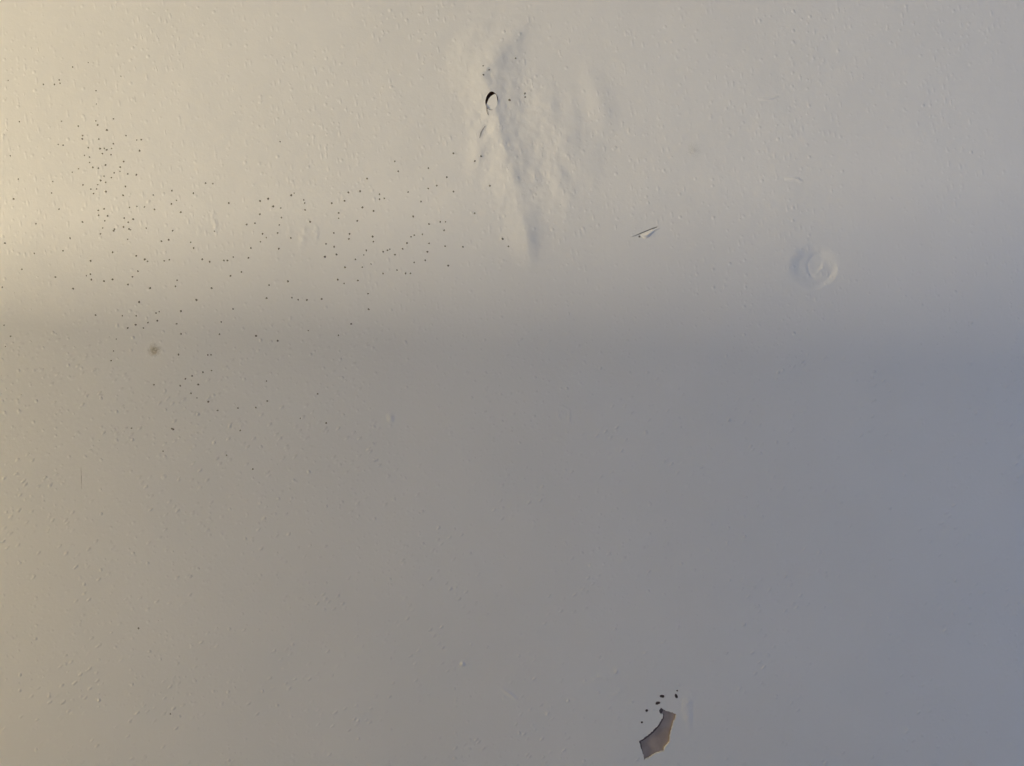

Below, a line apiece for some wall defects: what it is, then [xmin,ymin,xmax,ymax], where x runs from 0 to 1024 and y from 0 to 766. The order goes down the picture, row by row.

peeling [639,690,678,760]